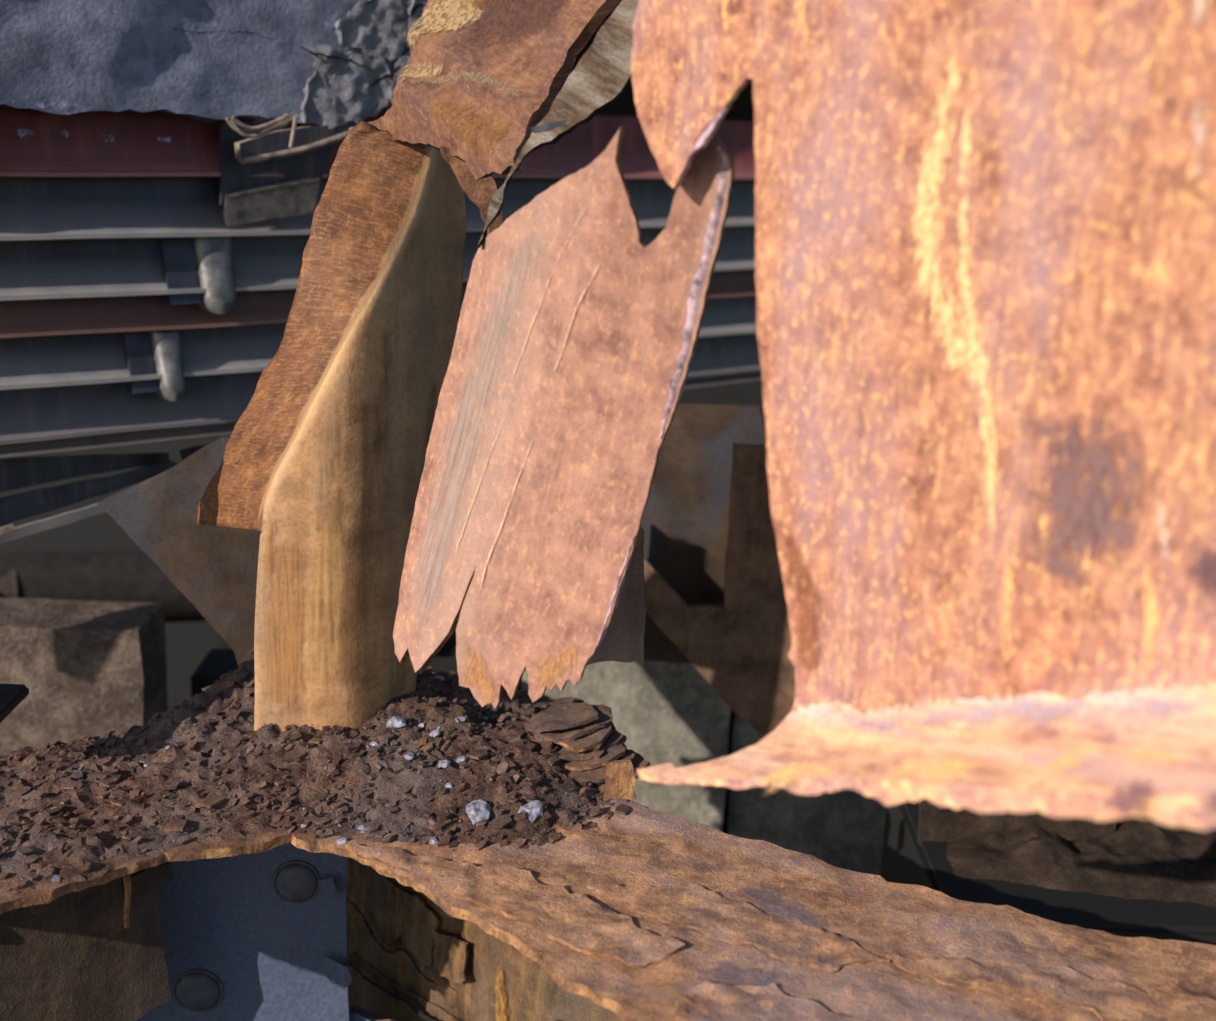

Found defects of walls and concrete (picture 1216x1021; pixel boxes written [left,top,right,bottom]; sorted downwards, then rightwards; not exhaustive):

corrosion [440,146,502,236]
corrosion [914,64,996,522]
corrosion [786,538,817,669]
corrosion [1191,548,1216,589]
corrosion [524,703,650,794]
corrosion [917,797,1116,846]
crack [347,898,448,1021]
corrosion [342,842,1216,1021]